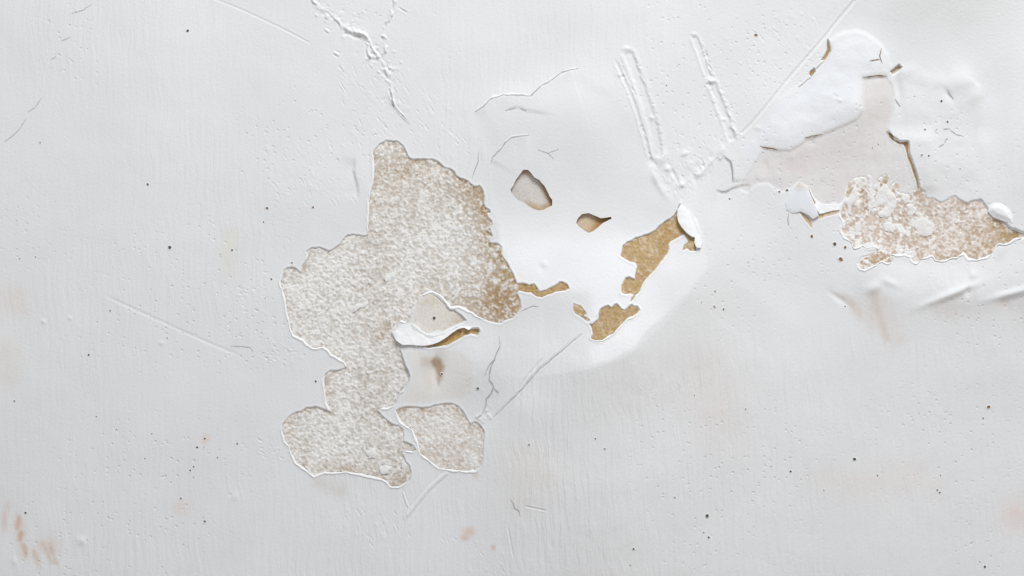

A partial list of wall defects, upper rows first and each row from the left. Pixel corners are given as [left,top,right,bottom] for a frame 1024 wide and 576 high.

crack [472,68,577,177]
spalling [742,63,1024,272]
peeling [677,204,702,251]
spalling [278,141,569,489]
peeling [573,304,589,322]